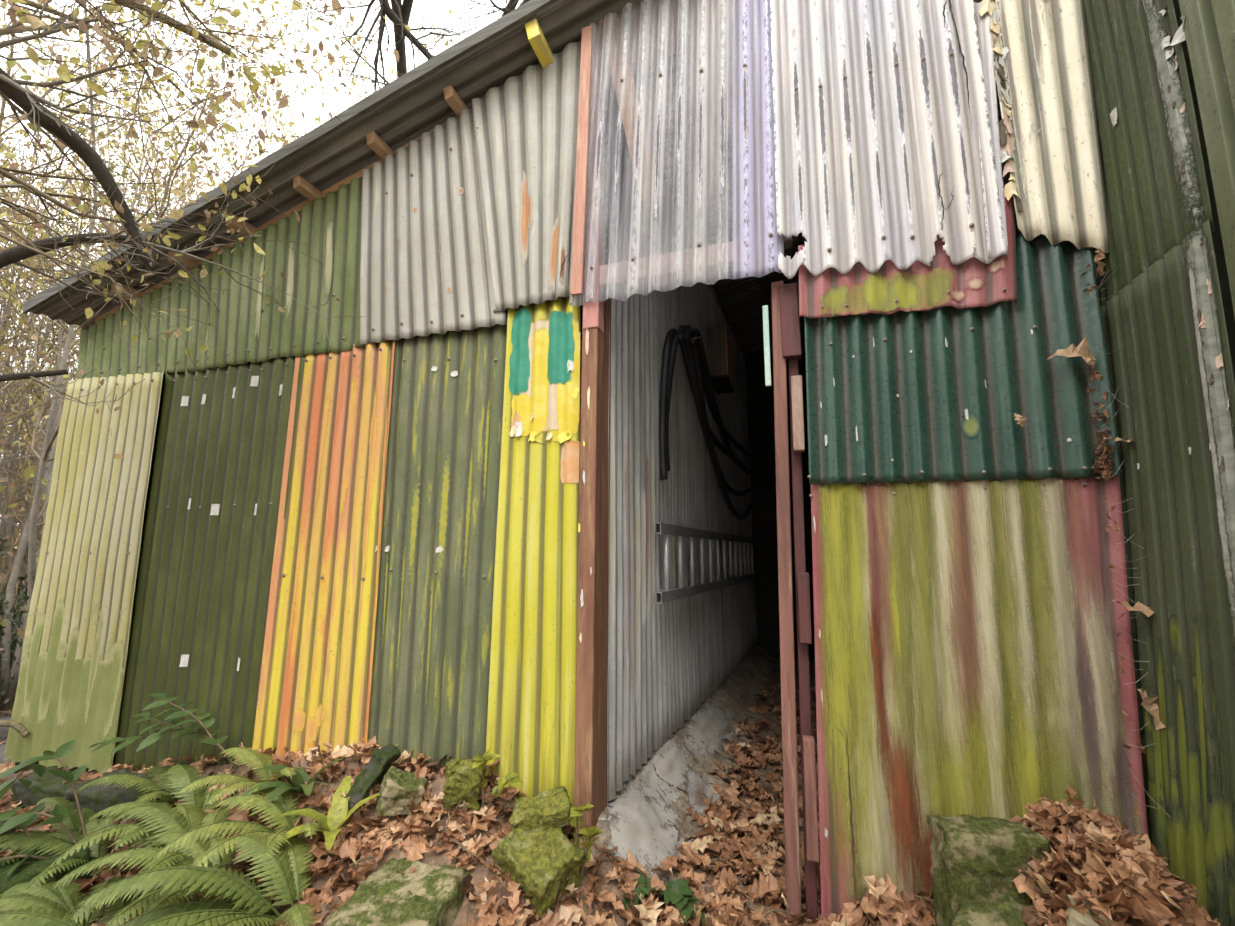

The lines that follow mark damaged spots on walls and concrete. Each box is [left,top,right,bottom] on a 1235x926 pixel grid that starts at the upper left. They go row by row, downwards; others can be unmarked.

crack [938,170,954,229]
crack [942,0,972,123]
peeling [1142,0,1235,647]
corrosion [869,610,934,900]